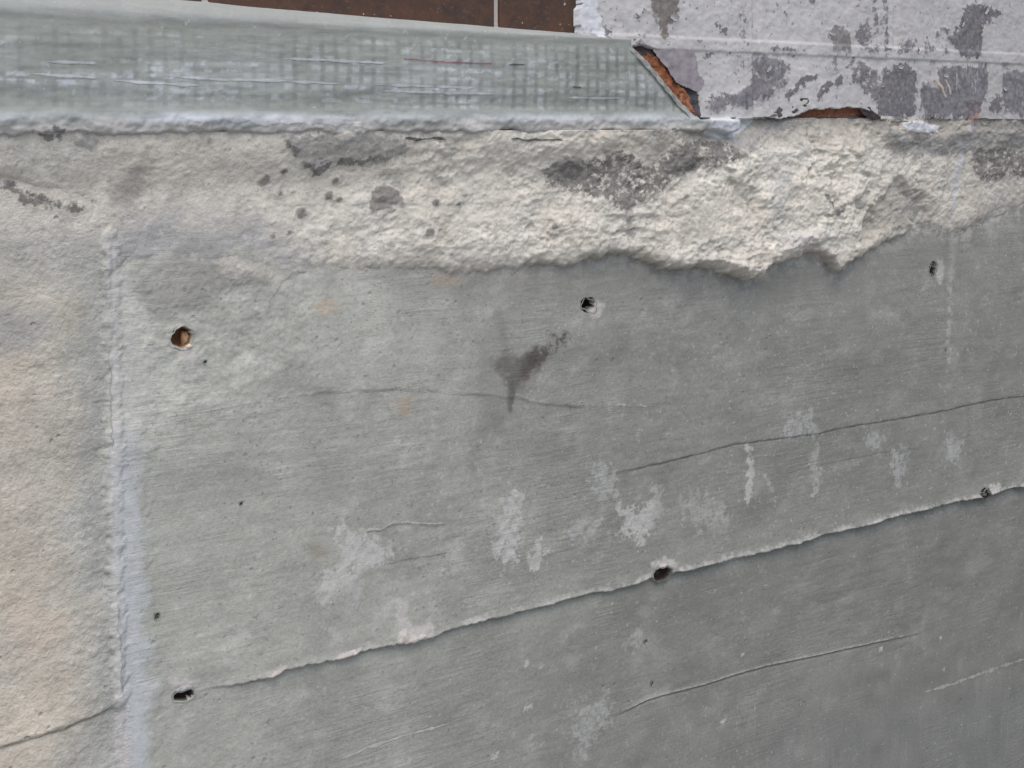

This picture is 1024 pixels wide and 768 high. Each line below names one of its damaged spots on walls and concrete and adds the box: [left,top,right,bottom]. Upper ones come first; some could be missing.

spalling [0,0,1024,288]
damp [378,110,1024,449]
damp [776,399,827,505]
crack [617,393,1024,475]
damp [859,417,915,491]
damp [938,428,971,477]
damp [309,514,400,621]
crack [356,520,447,534]
crack [388,552,447,564]
damp [427,431,778,587]
damp [617,620,653,660]